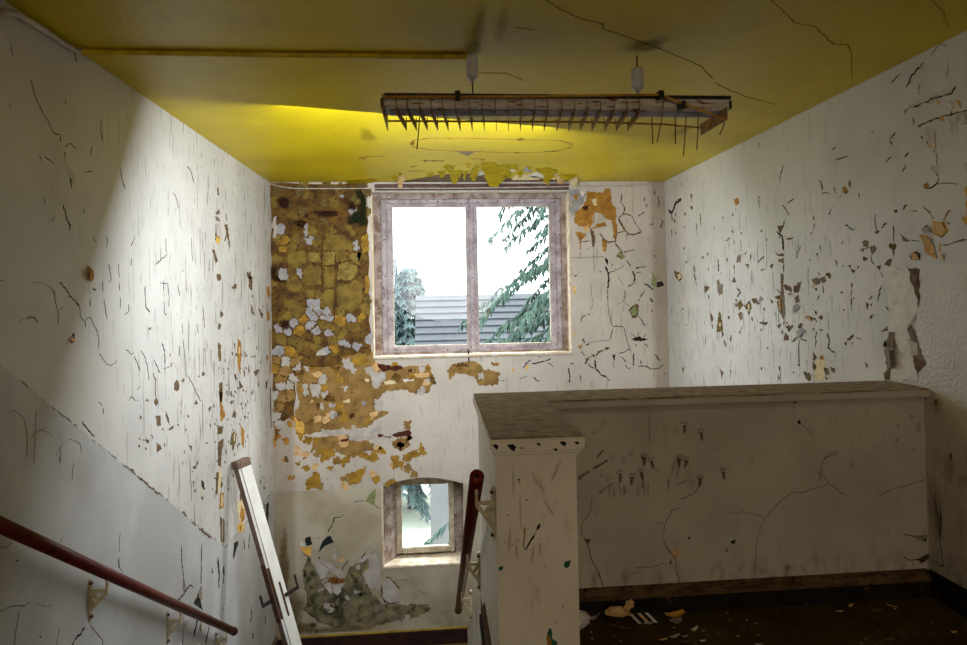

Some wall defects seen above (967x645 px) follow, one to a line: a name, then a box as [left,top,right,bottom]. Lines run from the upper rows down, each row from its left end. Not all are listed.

peeling [391,162,617,251]
crack [19,237,205,401]
crack [503,194,665,383]
peeling [674,205,950,382]
flaking render [182,179,436,559]
flaking render [447,349,500,386]
crack [7,402,104,478]
crack [131,469,162,496]
crack [183,511,212,539]
leakage [280,539,288,585]
leakage [290,598,362,633]
flaking render [300,536,431,627]